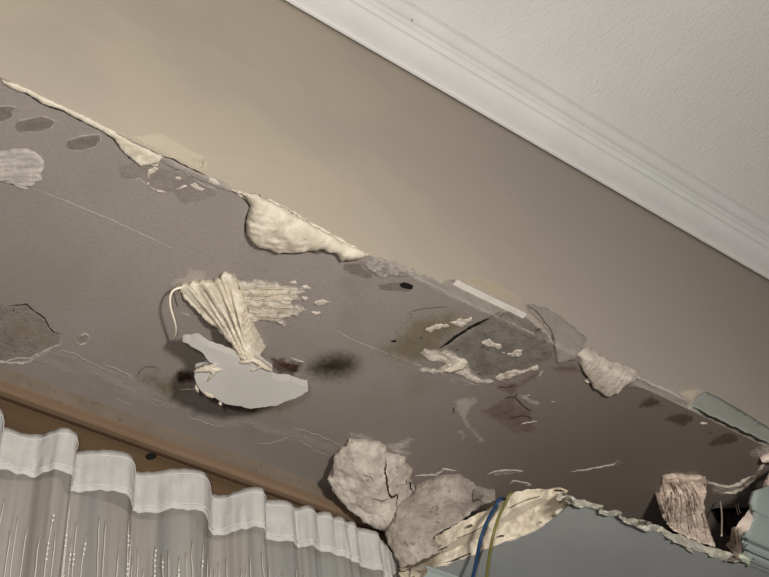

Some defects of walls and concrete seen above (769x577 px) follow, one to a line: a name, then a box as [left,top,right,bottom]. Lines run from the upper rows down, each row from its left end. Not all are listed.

peeling [0,105,57,133]
peeling [66,134,101,152]
water stain [381,307,470,363]
spalling [343,258,693,433]
spalling [751,445,769,463]
crack [363,458,413,537]
spalling [399,487,754,577]